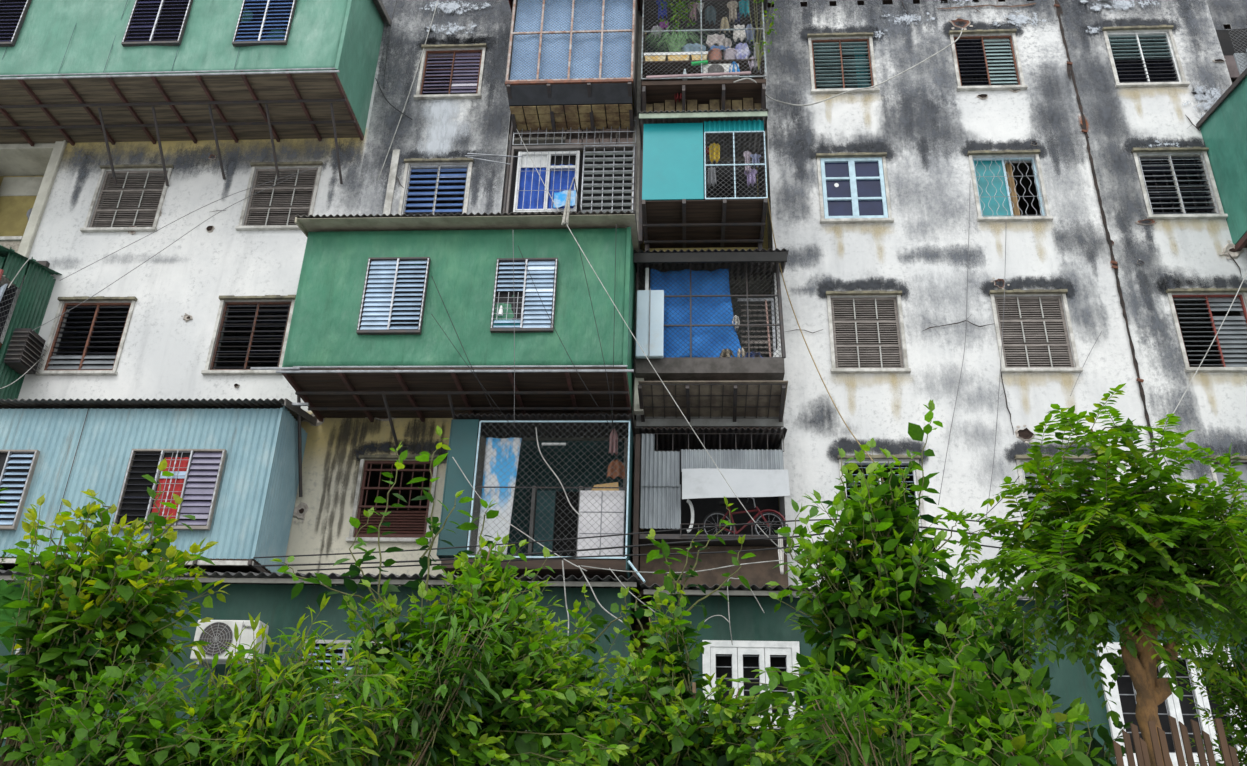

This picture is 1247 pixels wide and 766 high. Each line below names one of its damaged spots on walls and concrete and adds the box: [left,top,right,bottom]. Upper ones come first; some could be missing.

peeling [422,0,490,35]
peeling [875,0,973,38]
water stain [65,0,512,214]
water stain [764,0,1247,497]
water stain [317,418,448,554]